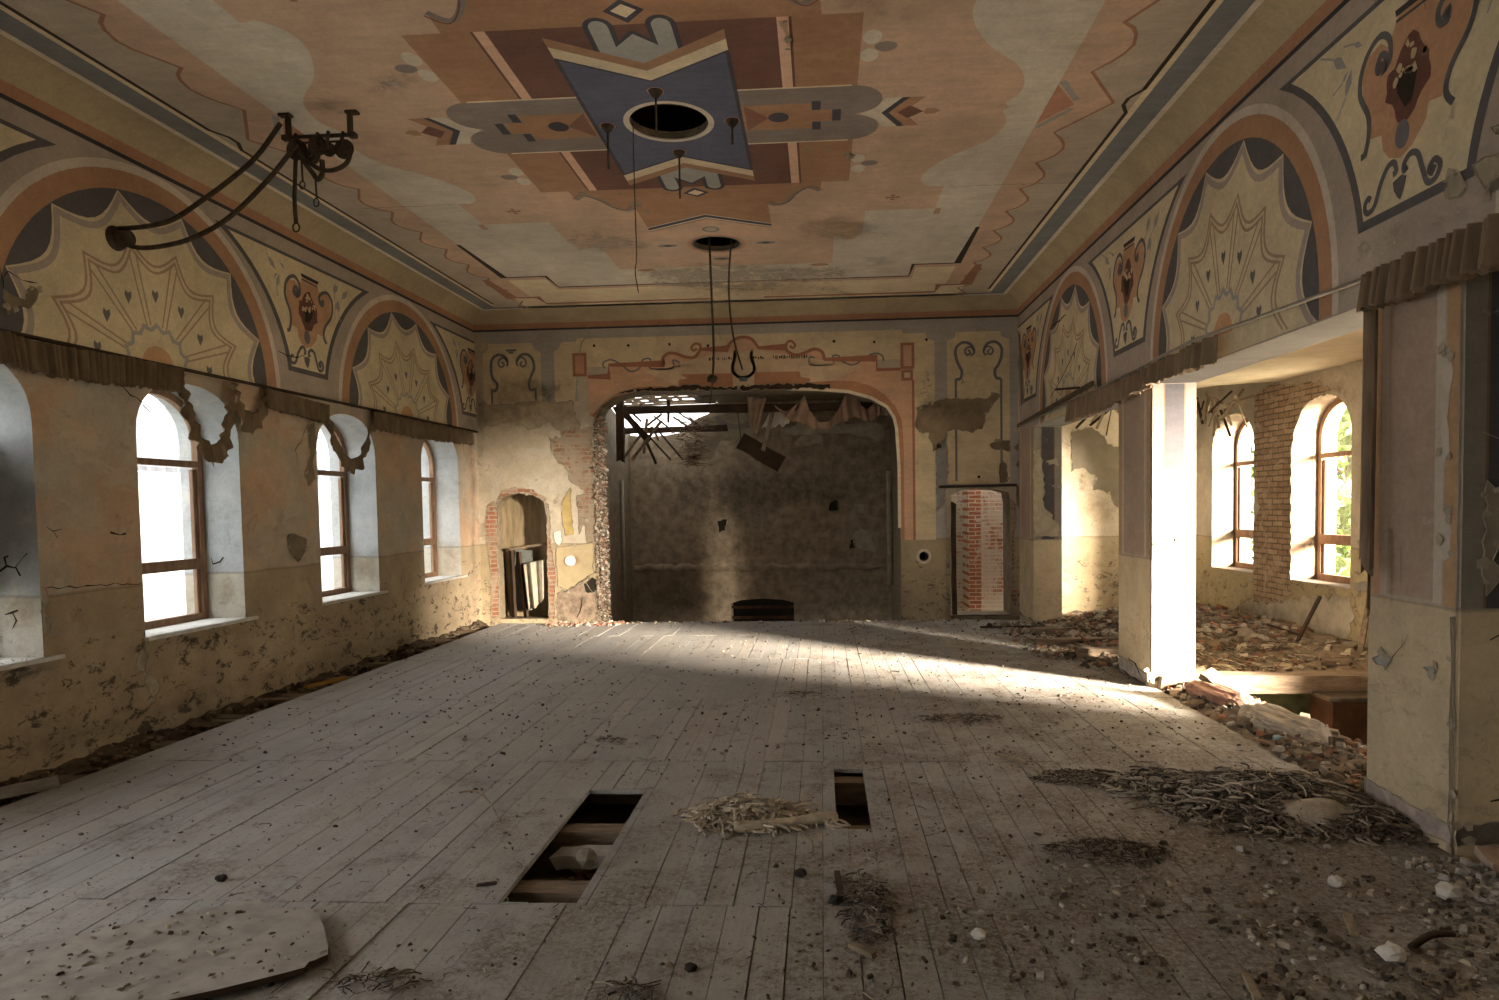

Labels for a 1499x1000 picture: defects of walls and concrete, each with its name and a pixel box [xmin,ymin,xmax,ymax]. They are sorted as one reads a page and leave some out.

crack [0,527,141,629]
flaking render [478,399,597,619]
flaking render [915,392,1119,618]
flaking render [1477,480,1499,596]